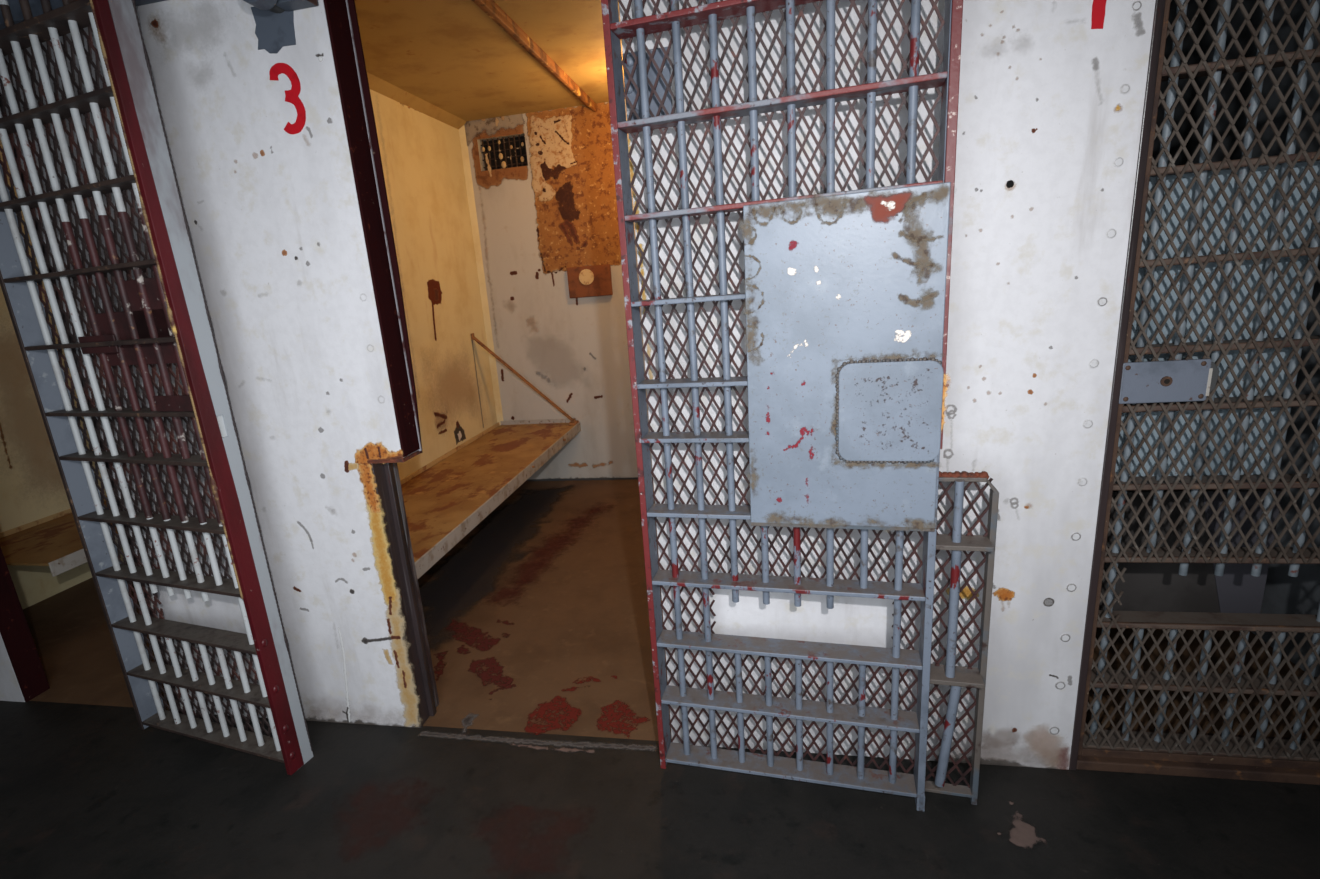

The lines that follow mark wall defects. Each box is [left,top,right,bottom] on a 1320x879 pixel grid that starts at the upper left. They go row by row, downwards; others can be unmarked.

flaking render [464,102,621,274]
rust [427,279,442,341]
rust [344,442,419,727]
rust [946,585,1015,601]
water stain [935,756,1026,767]